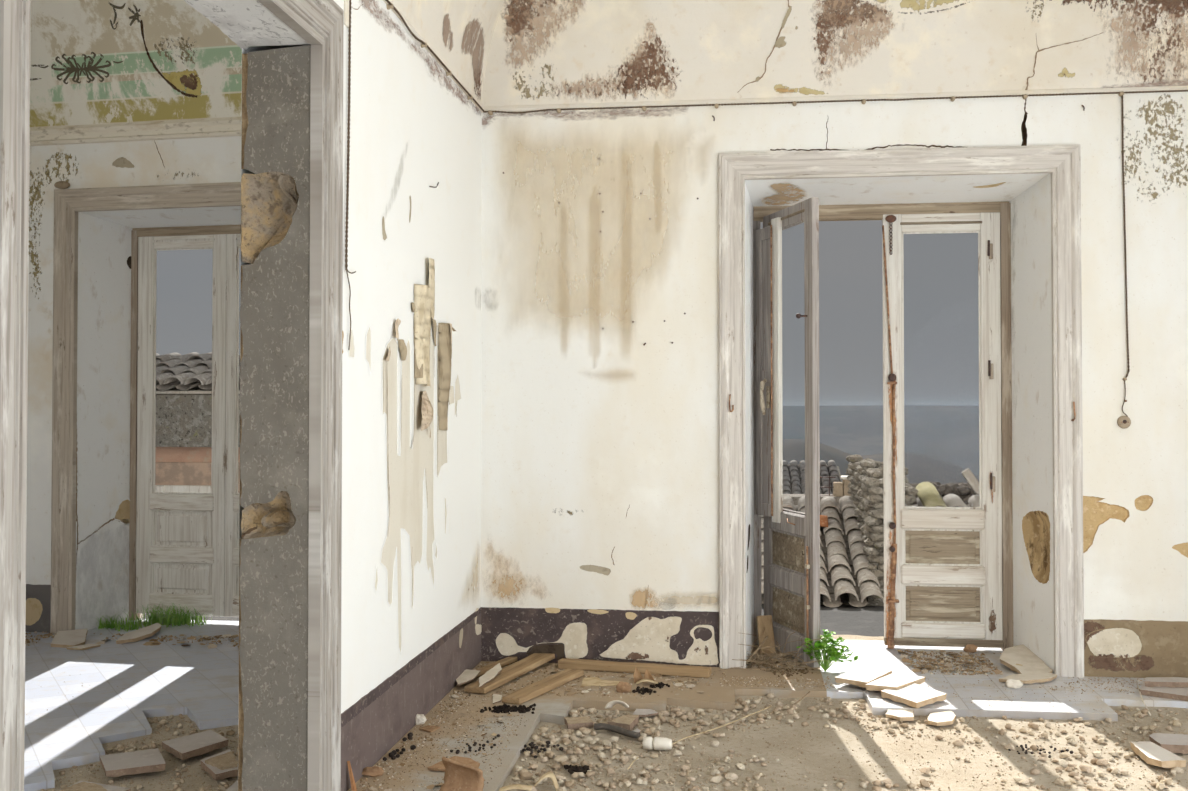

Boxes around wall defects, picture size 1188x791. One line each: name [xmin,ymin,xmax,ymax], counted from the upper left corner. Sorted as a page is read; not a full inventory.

leakage [504,0,682,99]
crack [737,0,798,93]
leakage [813,0,890,79]
peeling [900,0,959,12]
crack [1021,32,1104,146]
leakage [29,152,79,299]
peeling [342,258,461,655]
spalling [1022,511,1050,584]
spalling [1083,495,1153,553]
peeling [25,597,44,627]
peeling [459,608,482,648]
peeling [495,609,720,666]